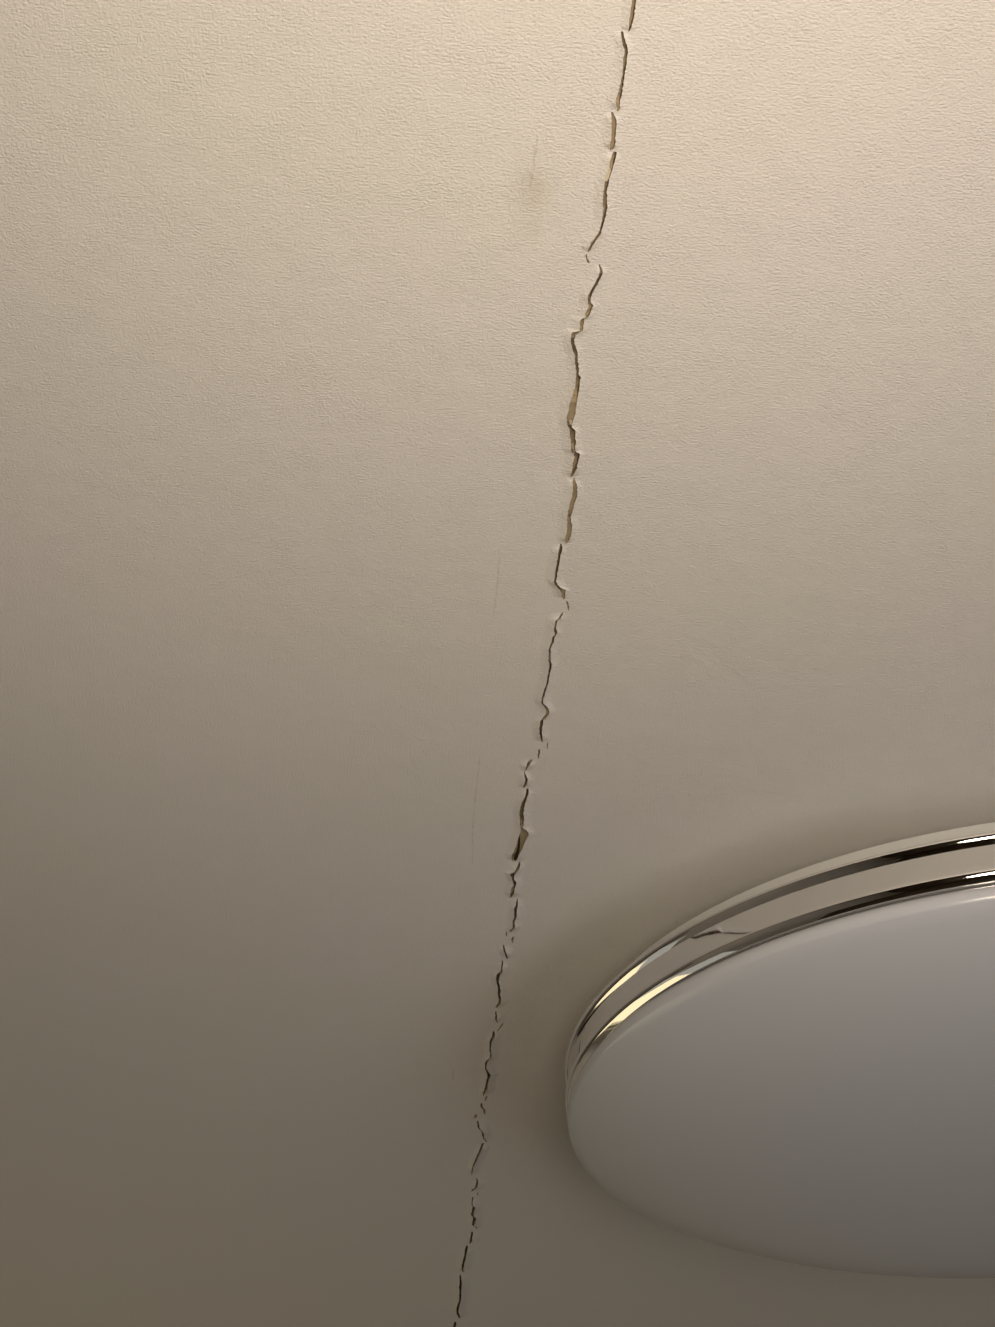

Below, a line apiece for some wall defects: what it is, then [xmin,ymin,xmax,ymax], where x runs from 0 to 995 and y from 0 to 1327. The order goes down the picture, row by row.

crack [447,0,643,1327]